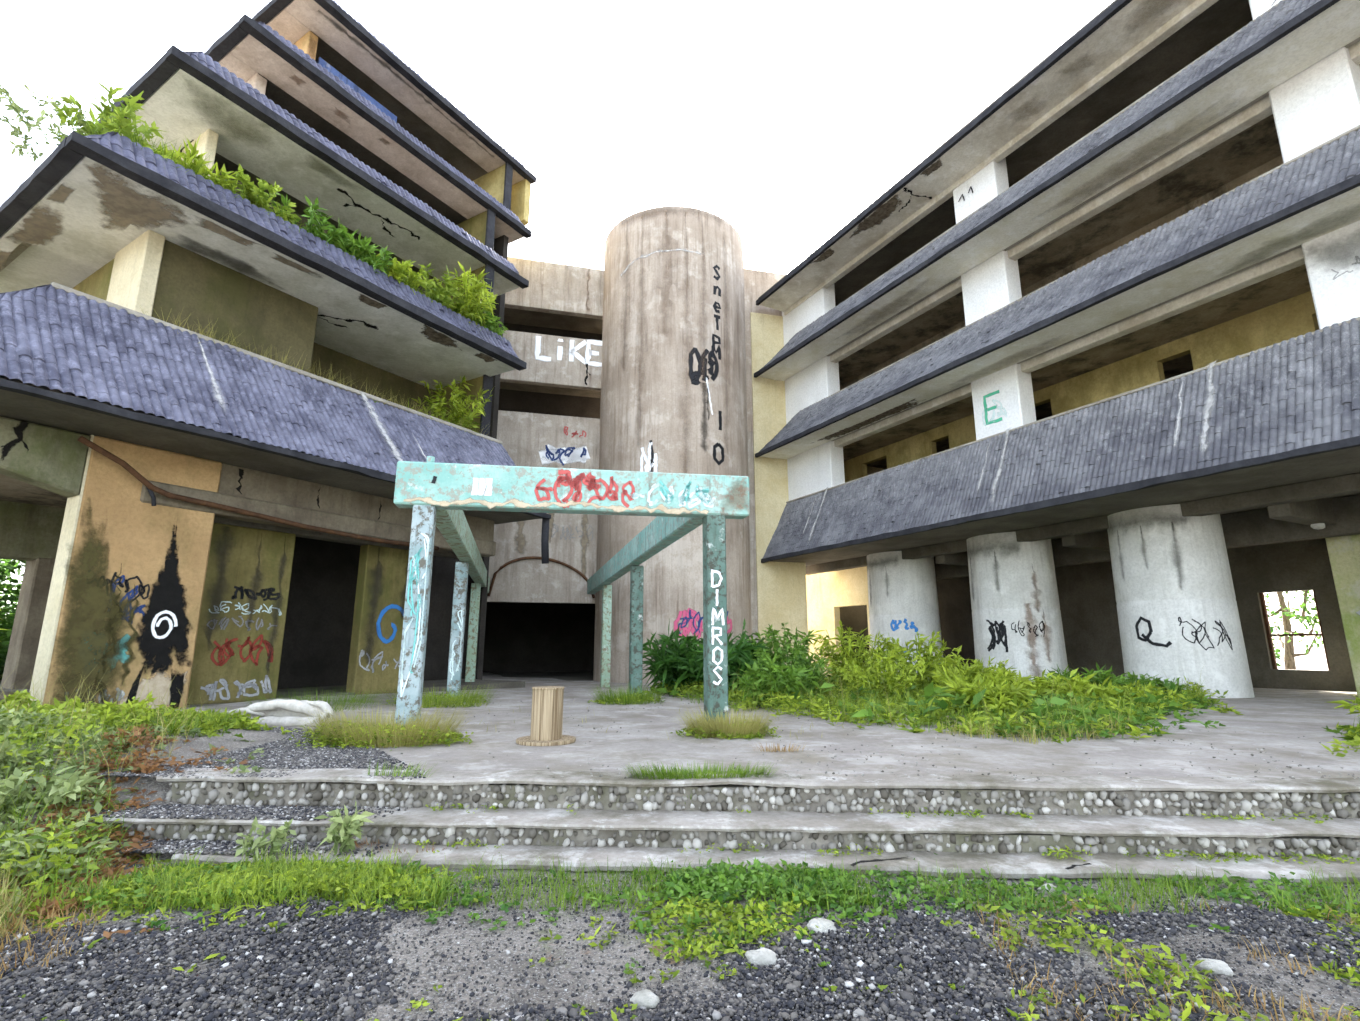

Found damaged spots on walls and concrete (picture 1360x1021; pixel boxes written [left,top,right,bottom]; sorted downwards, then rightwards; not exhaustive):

spalling [921,157,942,176]
crack [337,188,420,240]
spalling [850,195,902,238]
spalling [810,249,834,264]
crack [317,314,379,330]
crack [1,421,29,460]
peeling [404,497,709,515]
leakage [53,507,146,707]